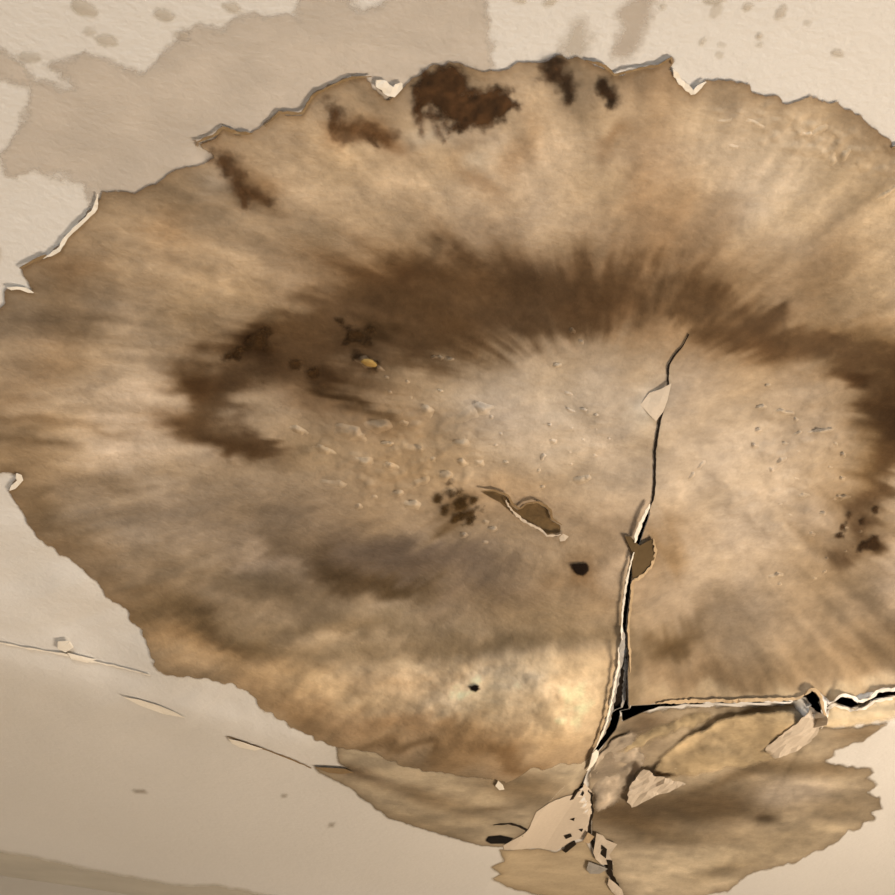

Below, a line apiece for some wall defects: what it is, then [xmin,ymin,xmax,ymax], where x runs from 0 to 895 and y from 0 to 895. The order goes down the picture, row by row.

water stain [0,0,494,208]
water stain [412,64,520,134]
water stain [539,57,575,105]
water stain [596,79,617,109]
water stain [43,194,98,259]
water stain [224,348,244,360]
water stain [246,335,266,350]
water stain [452,510,475,525]
crack [582,334,895,895]
water stain [315,747,591,847]
water stain [588,698,895,895]
water stain [492,841,615,895]